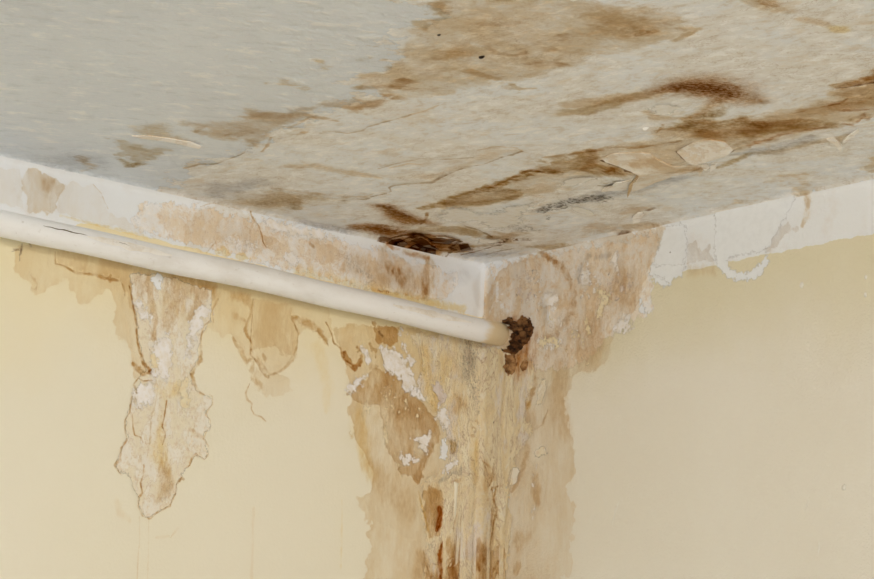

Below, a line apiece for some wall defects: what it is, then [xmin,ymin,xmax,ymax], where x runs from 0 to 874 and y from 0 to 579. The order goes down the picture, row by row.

peeling [130,0,874,302]
water stain [150,272,163,290]
water stain [352,205,426,235]
water stain [438,195,611,228]
water stain [648,223,688,288]
water stain [713,196,796,282]
water stain [131,331,191,420]
peeling [116,272,212,518]
water stain [183,300,215,359]
water stain [344,326,459,476]
corrosion [501,315,534,376]
peeling [404,230,660,579]